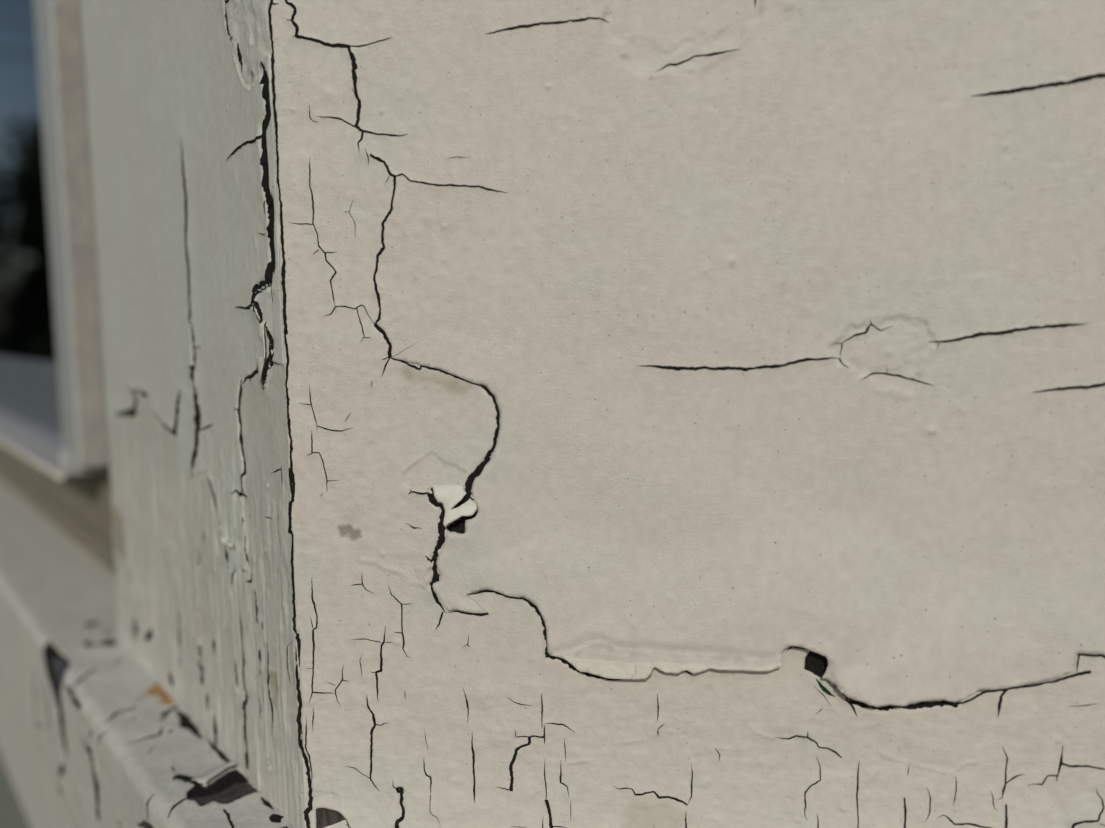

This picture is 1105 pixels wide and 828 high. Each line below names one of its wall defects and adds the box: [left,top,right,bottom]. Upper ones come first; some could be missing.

peeling [227,0,270,89]
crack [974,73,1105,96]
crack [640,321,935,386]
crack [931,323,1085,348]
crack [43,0,693,828]
peeling [391,329,1105,707]
peeling [84,320,303,828]
crack [777,654,1105,828]
peeling [316,808,346,828]